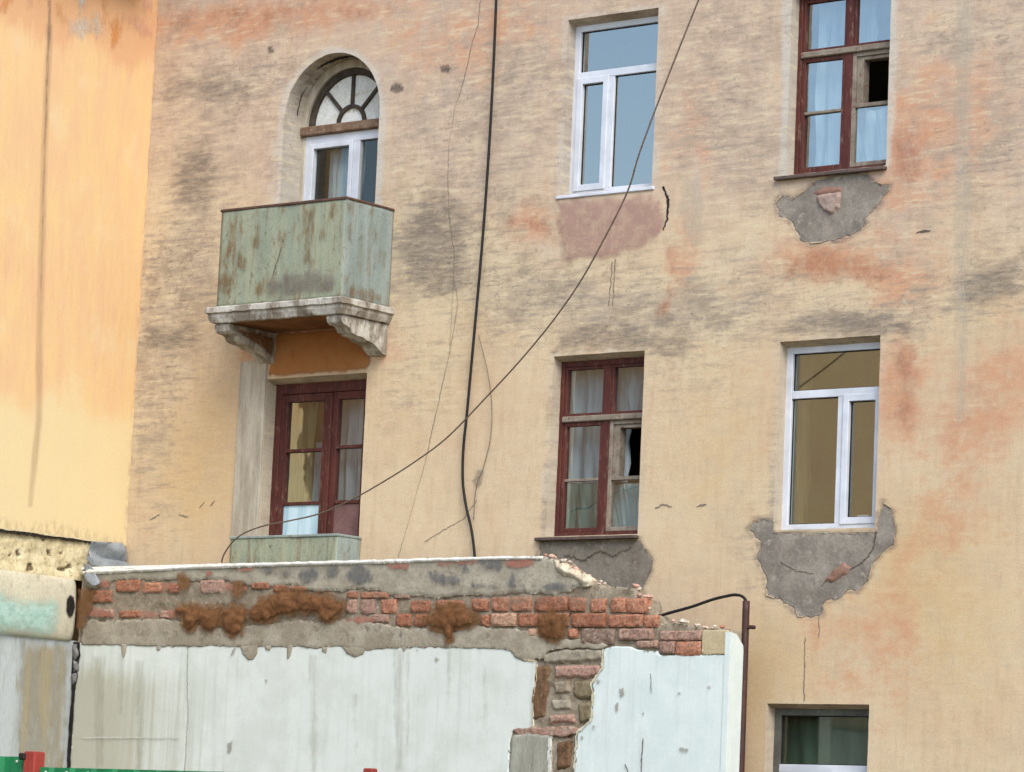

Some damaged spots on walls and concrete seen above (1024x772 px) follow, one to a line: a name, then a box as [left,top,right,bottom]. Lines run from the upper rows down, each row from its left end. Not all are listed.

crack [662,186,670,230]
spalling [775,172,891,244]
spalling [0,531,99,581]
spalling [539,539,653,590]
spalling [750,502,896,617]
crack [803,616,820,701]
peeling [81,619,608,772]